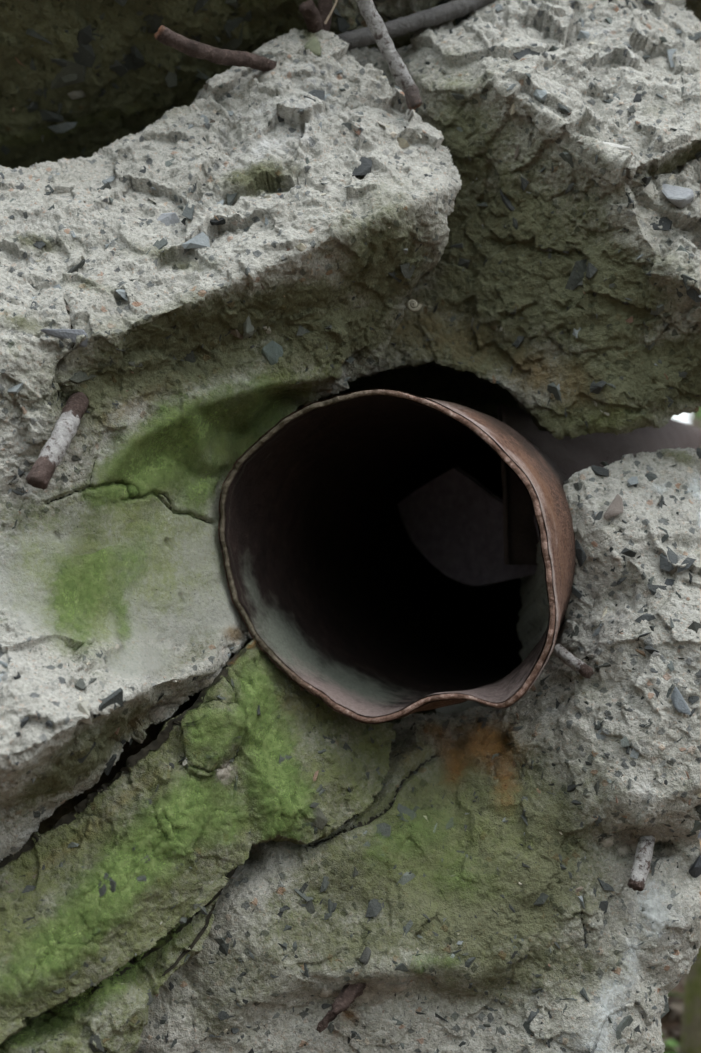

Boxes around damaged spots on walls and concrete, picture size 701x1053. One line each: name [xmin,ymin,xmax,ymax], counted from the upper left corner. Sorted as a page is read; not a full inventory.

spalling [308,157,372,218]
leakage [91,475,157,503]
crack [47,460,210,523]
spalling [567,483,696,678]
spalling [75,677,123,725]
crack [0,648,246,868]
leakage [145,780,247,848]
leakage [260,767,311,839]
crack [308,756,435,847]
leakage [0,903,114,993]
crack [0,866,238,1047]
spalling [496,854,669,1053]